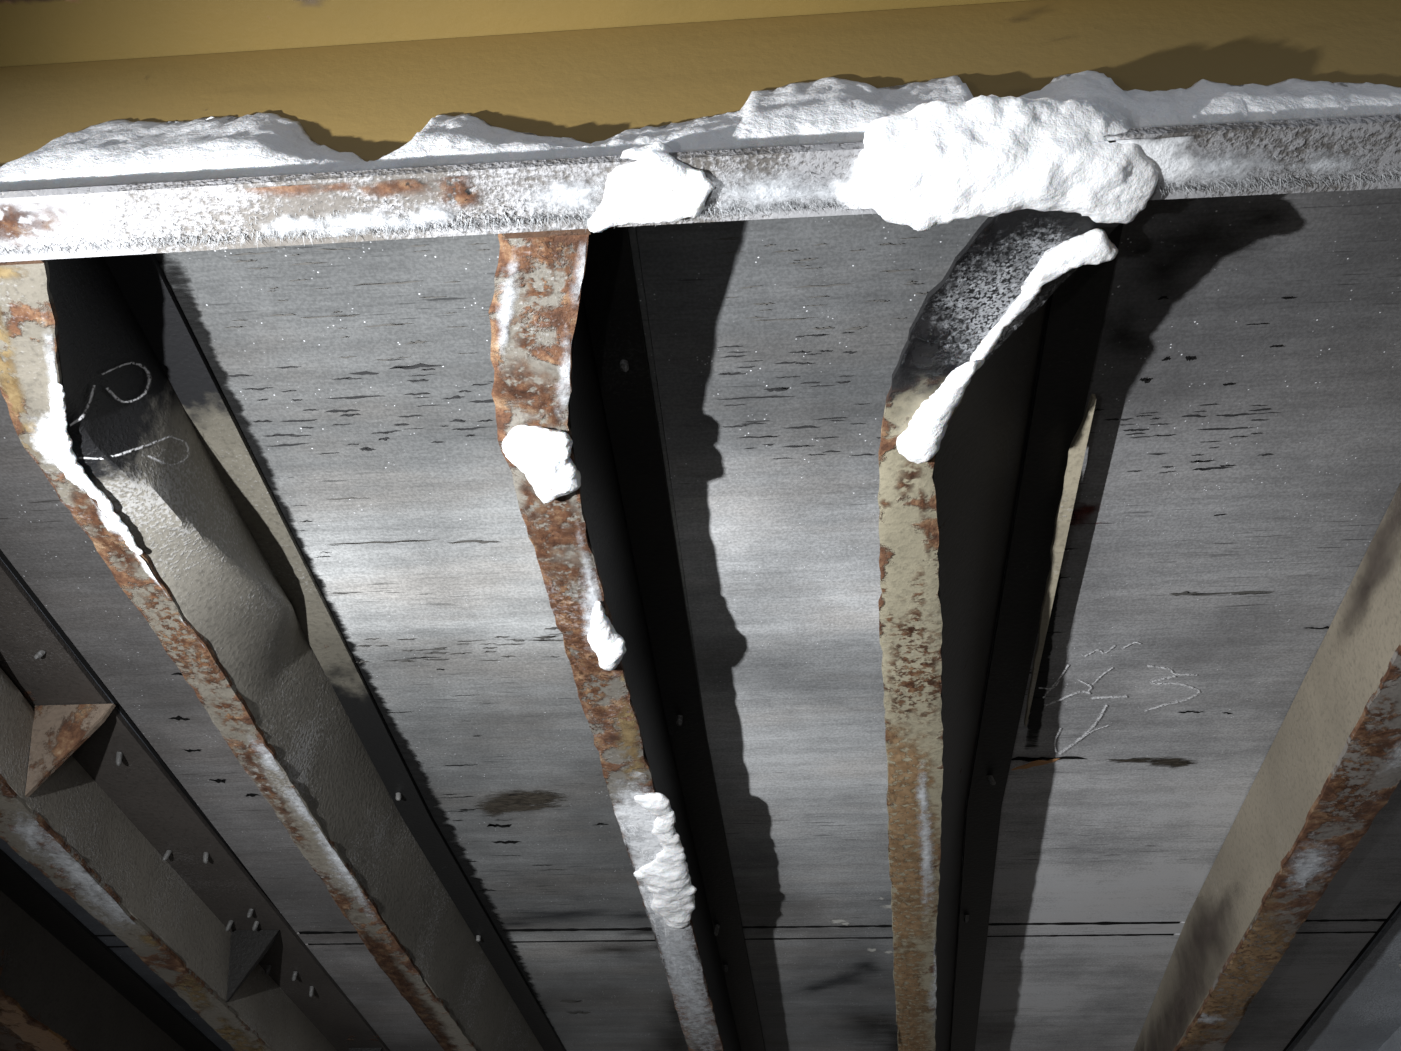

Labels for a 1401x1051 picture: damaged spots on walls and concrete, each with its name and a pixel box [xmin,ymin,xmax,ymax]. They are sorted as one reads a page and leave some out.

corrosion [0,213,22,237]
corrosion [502,237,568,427]
leakage [900,229,1000,378]
corrosion [74,492,134,575]
corrosion [146,592,239,731]
leakage [154,253,546,1013]
corrosion [522,484,625,714]
corrosion [881,462,926,512]
leakage [1025,548,1077,749]
corrosion [1070,506,1105,525]
corrosion [886,575,939,1051]
corrosion [366,936,456,1051]